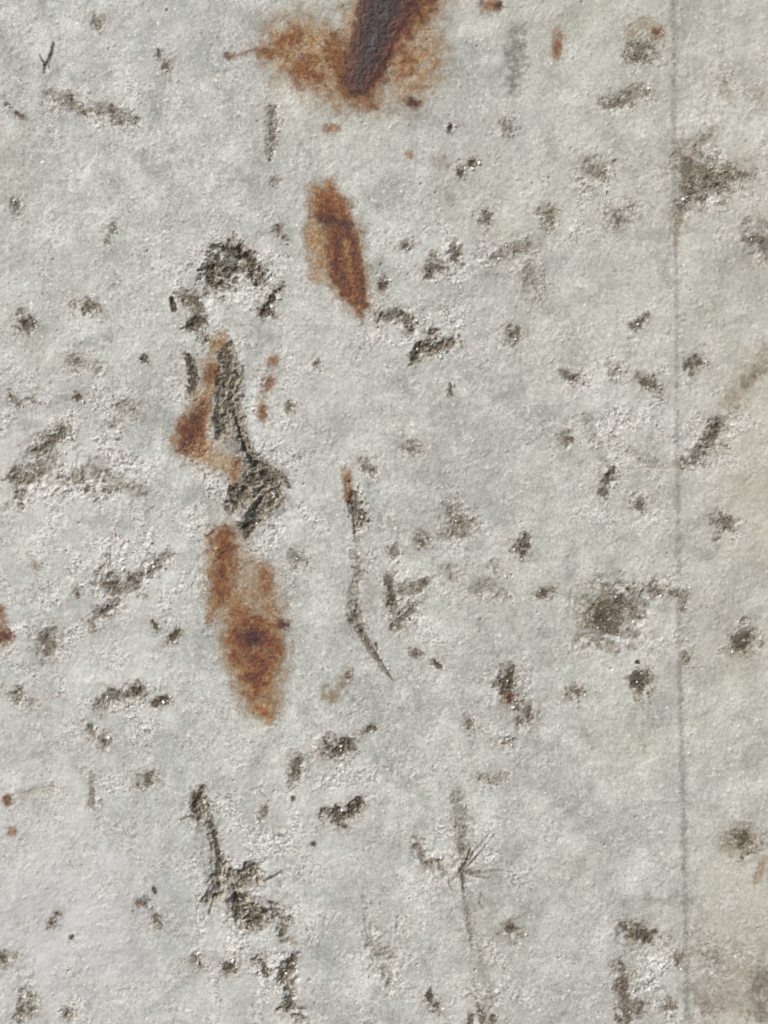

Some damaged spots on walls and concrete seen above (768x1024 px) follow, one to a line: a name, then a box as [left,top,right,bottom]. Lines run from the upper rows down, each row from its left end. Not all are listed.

rust [224,0,447,131]
rust [304,180,369,316]
rust [173,332,243,483]
rust [205,524,289,725]